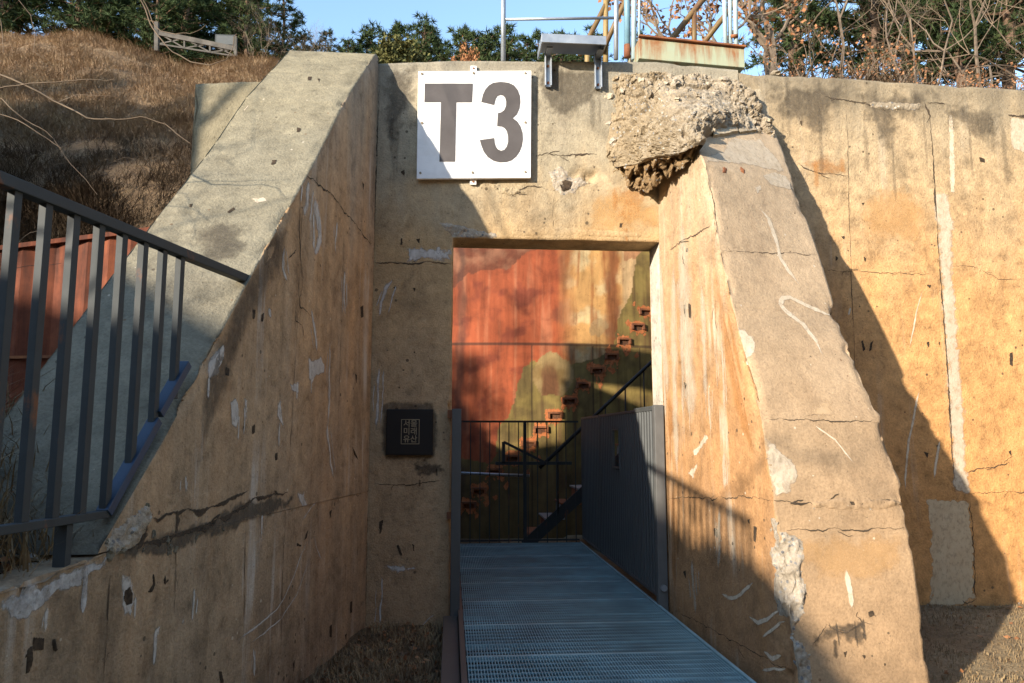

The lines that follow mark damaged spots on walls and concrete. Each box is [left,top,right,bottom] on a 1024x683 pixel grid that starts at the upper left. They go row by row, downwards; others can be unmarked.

crack [538,151,597,161]
spalling [604,71,794,193]
water stain [785,89,836,131]
water stain [874,97,920,135]
peeling [409,247,450,260]
crack [125,89,449,639]
crack [801,96,1024,606]
peeling [926,115,976,606]
spalling [3,493,307,619]
spalling [765,444,797,495]
crack [667,494,904,537]
spalling [770,518,812,683]